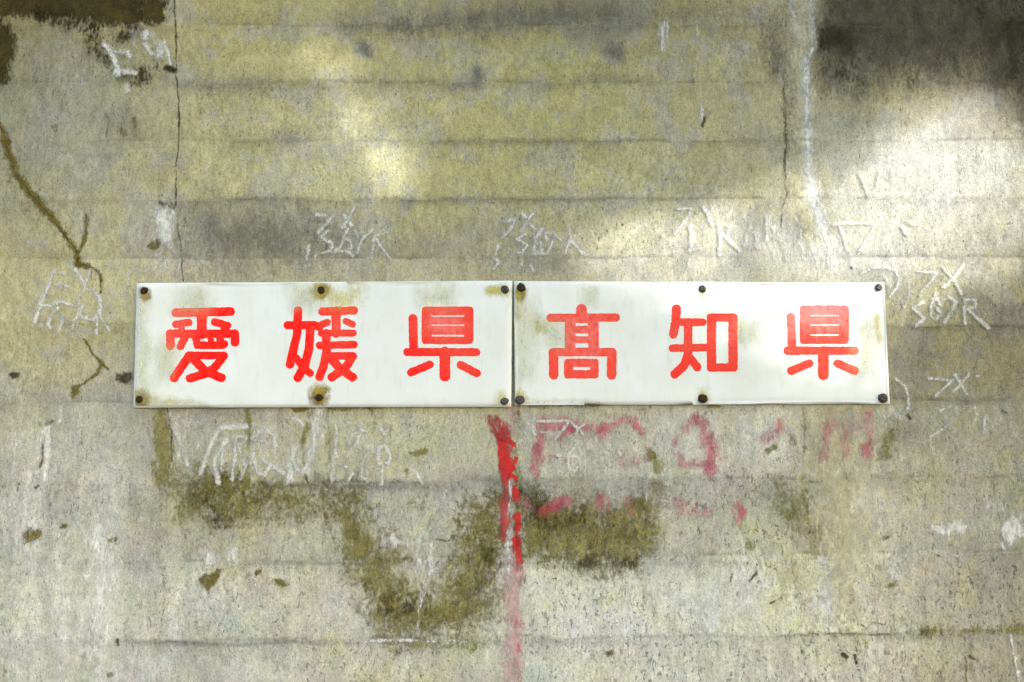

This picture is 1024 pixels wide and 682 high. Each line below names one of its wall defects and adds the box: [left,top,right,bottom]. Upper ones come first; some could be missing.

water stain [0,0,169,85]
water stain [122,64,176,87]
crack [162,0,184,281]
crack [780,50,795,232]
water stain [764,0,1024,278]
crack [0,122,103,293]
crack [71,338,109,398]
water stain [286,407,383,484]
water stain [647,448,667,485]
water stain [199,544,238,600]
water stain [381,514,402,546]
water stain [488,405,597,682]